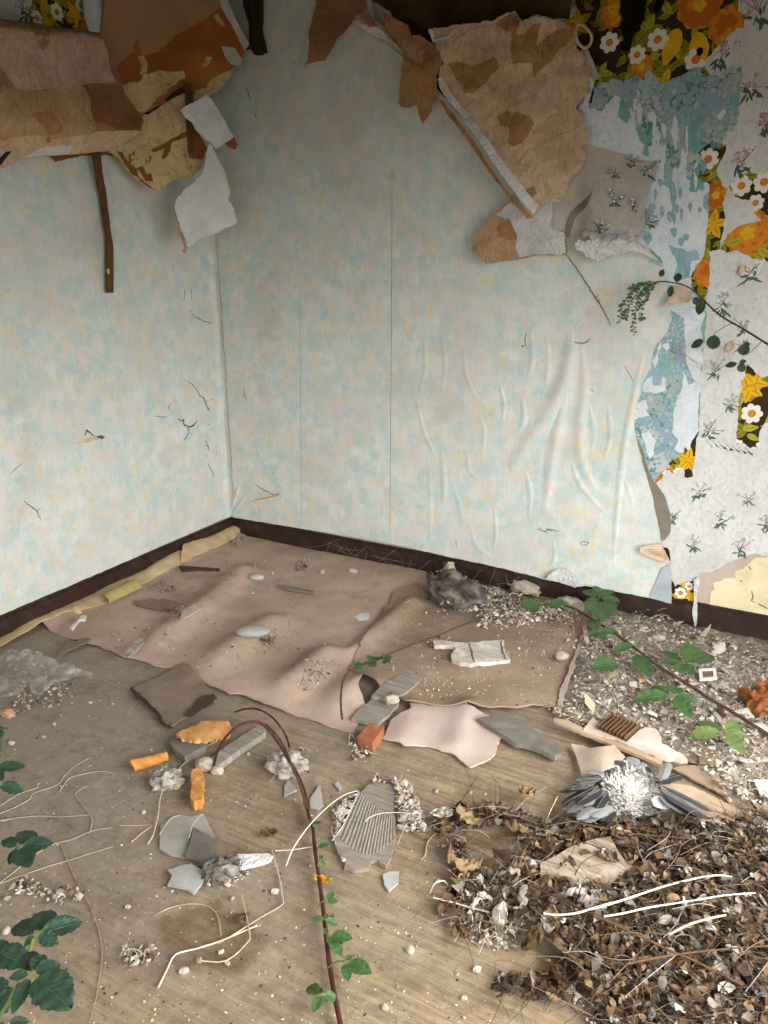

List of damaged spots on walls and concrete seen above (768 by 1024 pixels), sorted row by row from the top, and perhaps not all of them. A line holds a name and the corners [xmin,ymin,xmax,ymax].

peeling [372,0,571,29]
peeling [584,90,710,453]
crack [158,381,215,477]
peeling [642,431,656,459]
flaking render [709,557,768,615]